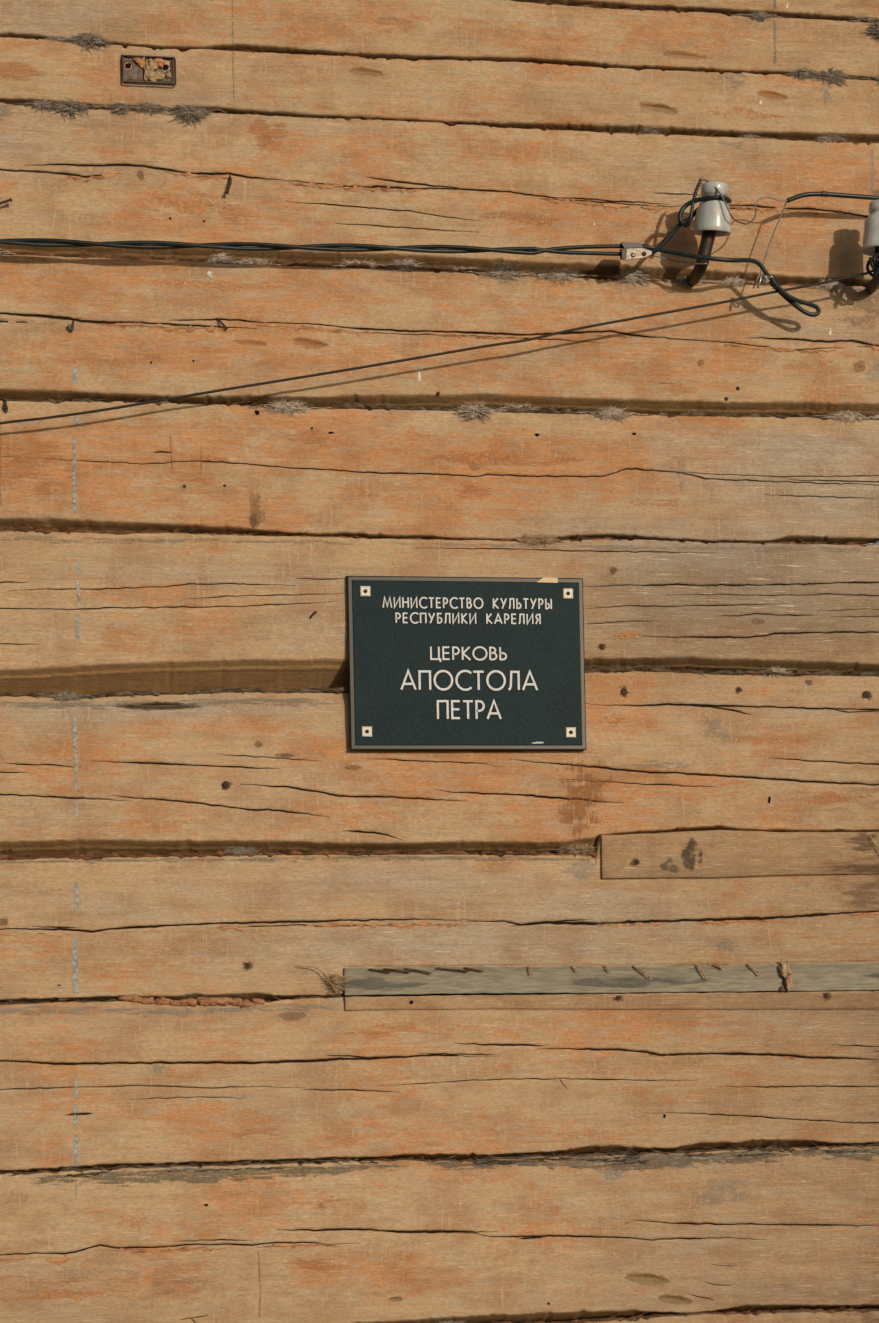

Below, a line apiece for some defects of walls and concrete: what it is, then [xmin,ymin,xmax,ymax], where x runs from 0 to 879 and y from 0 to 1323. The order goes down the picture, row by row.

rust [132,57,172,81]
crack [0,163,698,232]
crack [0,312,879,353]
crack [587,703,879,715]
crack [0,754,879,840]
crack [0,1043,879,1124]
crack [0,1220,870,1300]